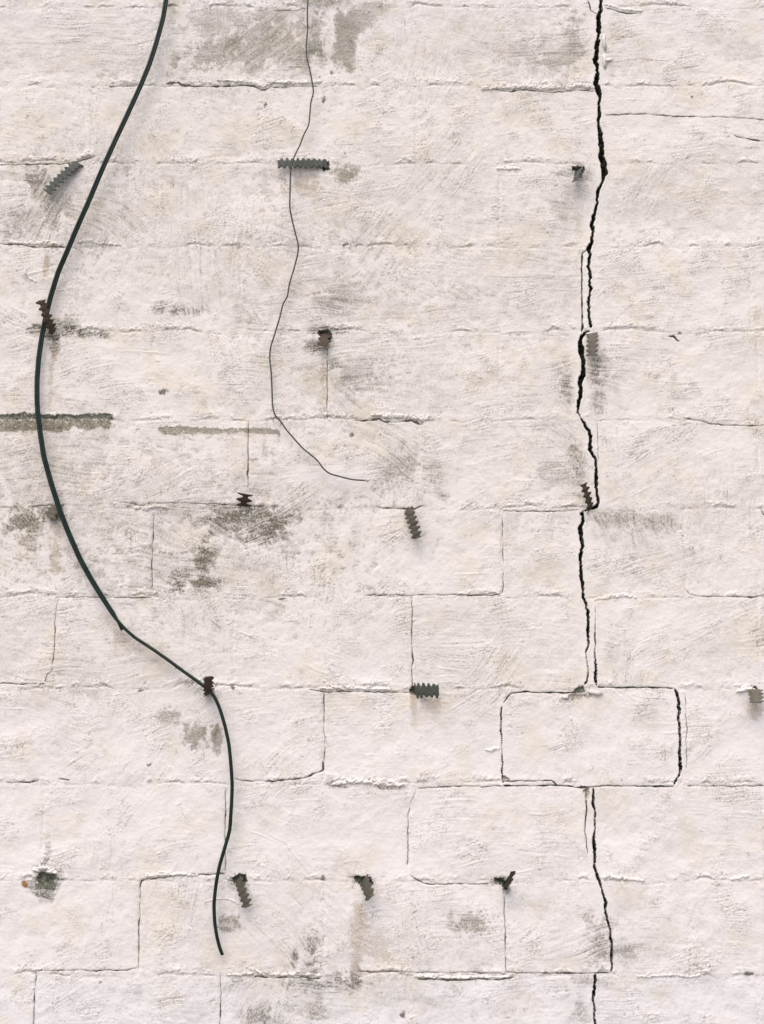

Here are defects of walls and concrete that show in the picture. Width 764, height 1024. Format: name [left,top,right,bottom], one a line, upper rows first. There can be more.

damp [169,505,293,592]
crack [356,0,764,1023]